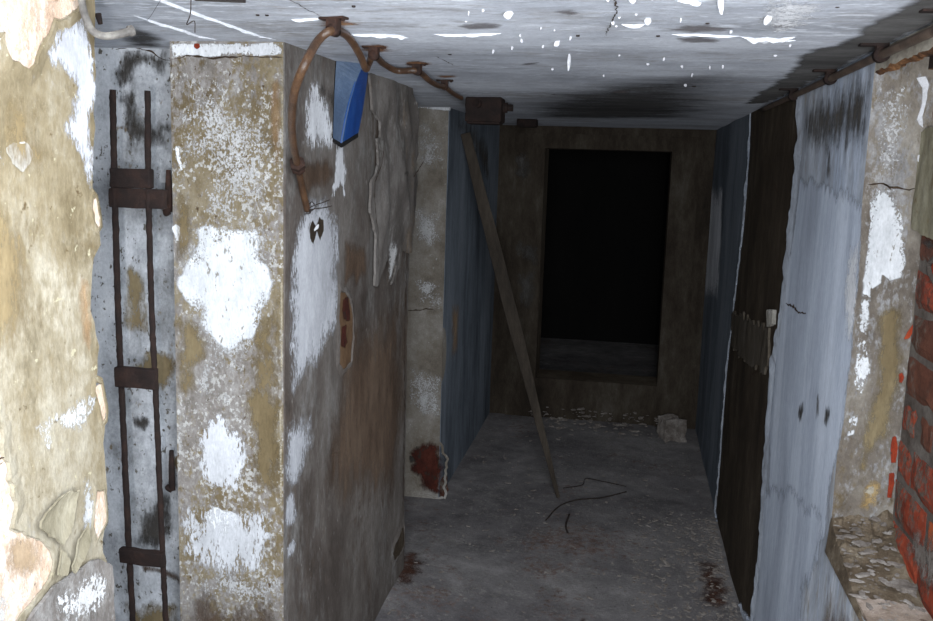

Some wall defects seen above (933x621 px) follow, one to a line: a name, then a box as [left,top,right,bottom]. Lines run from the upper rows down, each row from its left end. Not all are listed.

spalling [0,0,88,86]
damp [177,194,190,254]
spalling [91,375,109,429]
damp [247,301,281,490]
spalling [0,400,116,621]